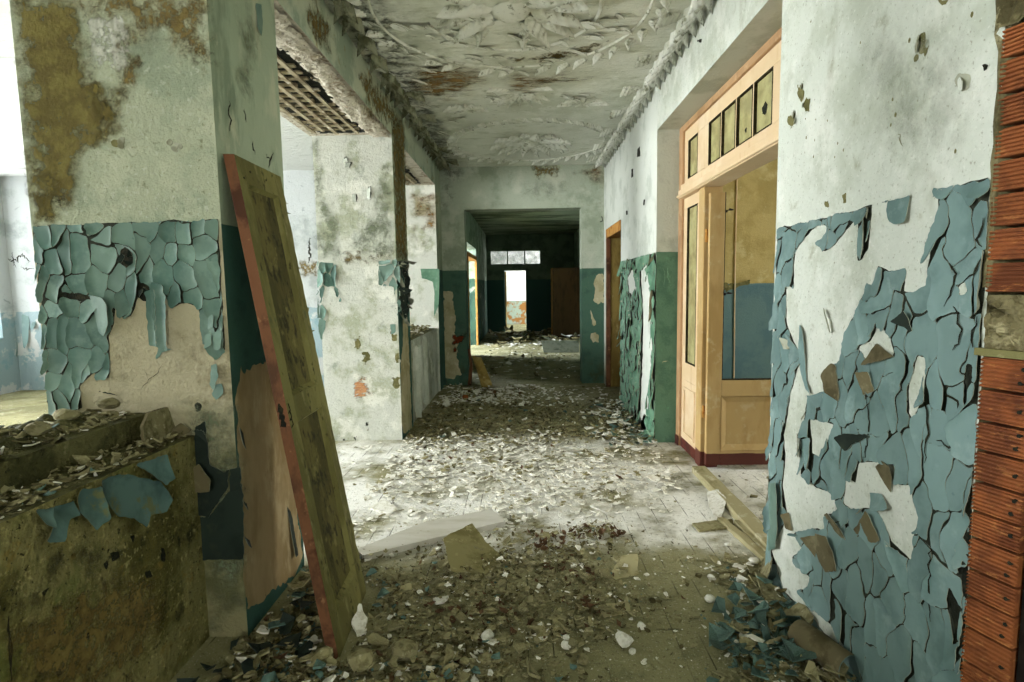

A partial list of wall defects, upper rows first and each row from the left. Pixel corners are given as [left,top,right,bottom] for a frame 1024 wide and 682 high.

water stain [14,0,208,220]
spalling [255,2,389,138]
peeling [16,219,303,609]
water stain [299,203,337,276]
peeling [316,262,341,340]
spalling [378,259,462,433]
peeling [590,274,604,343]
peeling [616,253,656,441]
peeling [762,0,1024,682]